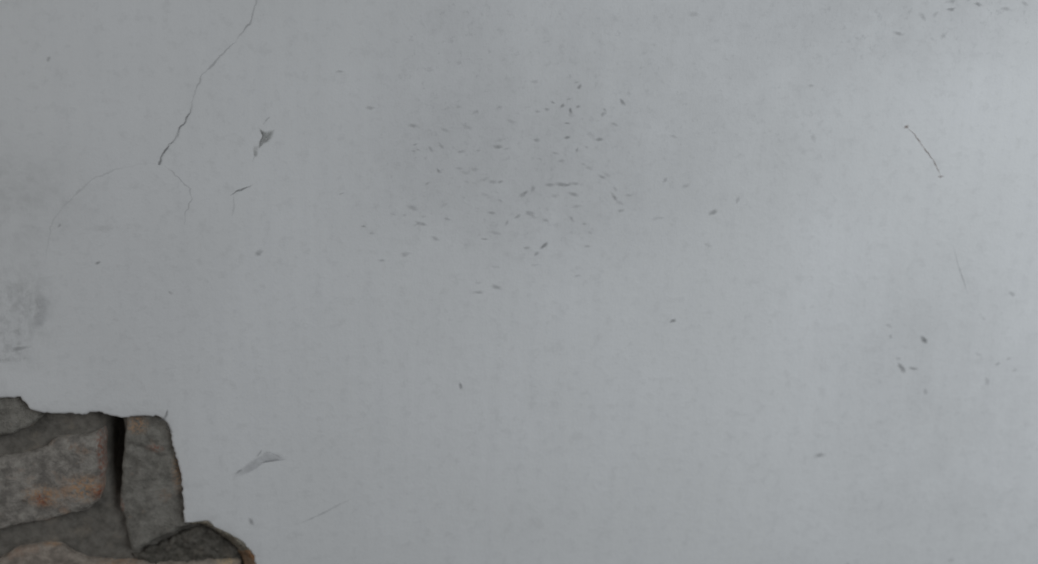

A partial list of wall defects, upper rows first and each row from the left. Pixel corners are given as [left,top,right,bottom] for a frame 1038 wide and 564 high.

flaking render [0,397,256,564]